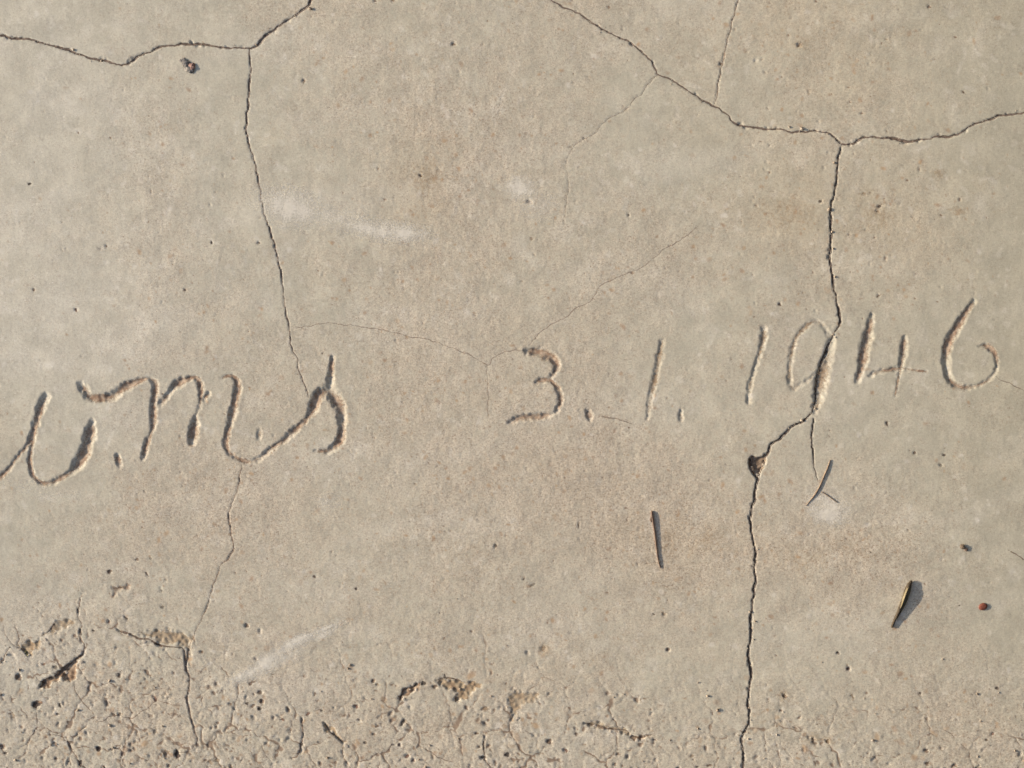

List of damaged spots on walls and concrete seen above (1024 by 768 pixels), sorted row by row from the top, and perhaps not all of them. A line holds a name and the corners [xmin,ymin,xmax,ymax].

crack [0,0,519,413]
crack [551,0,1024,768]
spalling [18,609,95,656]
crack [29,468,242,768]
spalling [120,616,203,662]
spalling [40,655,84,689]
spalling [399,674,480,702]
spalling [324,724,349,748]
spalling [587,722,656,742]